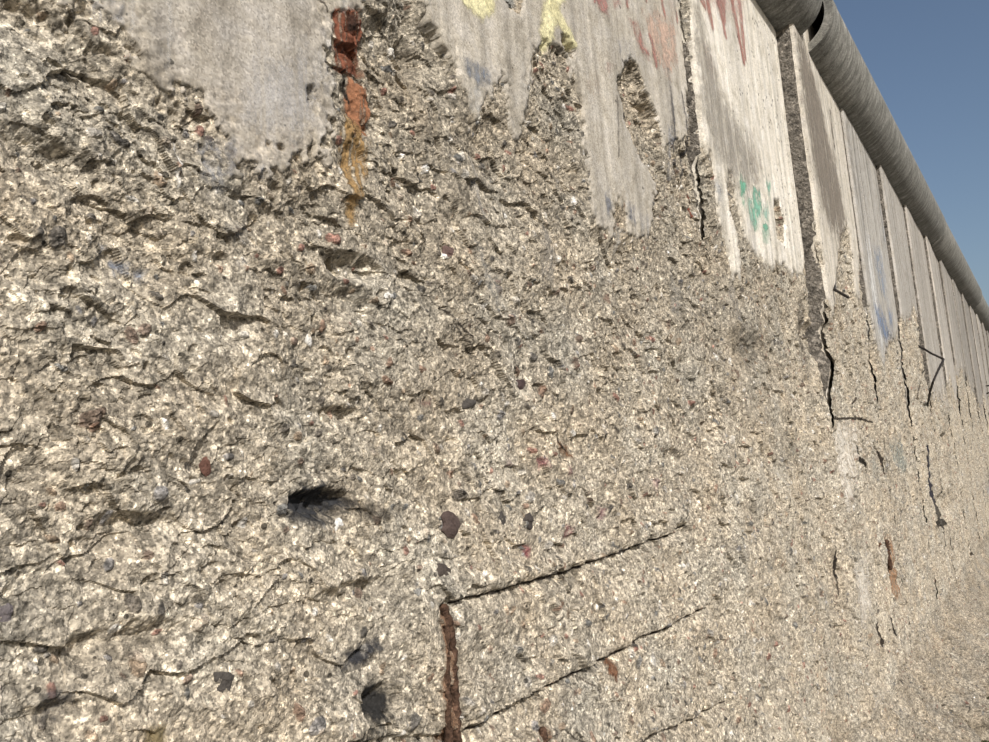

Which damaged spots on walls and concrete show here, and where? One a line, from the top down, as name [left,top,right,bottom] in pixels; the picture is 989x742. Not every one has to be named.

spalling [505,0,523,14]
spalling [680,0,692,43]
rust [333,9,371,224]
spalling [0,0,462,742]
spalling [394,44,989,742]
crack [926,445,947,546]
crack [447,511,688,604]
crack [463,603,710,730]
crack [643,701,725,742]